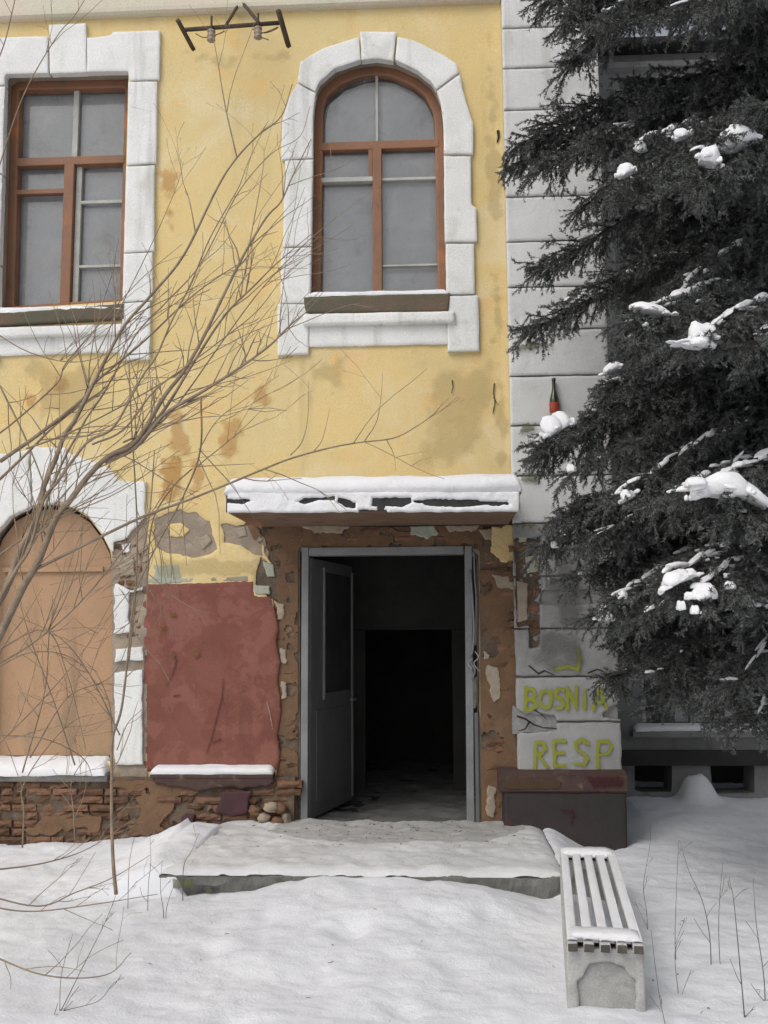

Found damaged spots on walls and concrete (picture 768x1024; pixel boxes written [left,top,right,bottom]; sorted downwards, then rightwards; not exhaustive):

spalling [0,509,556,845]